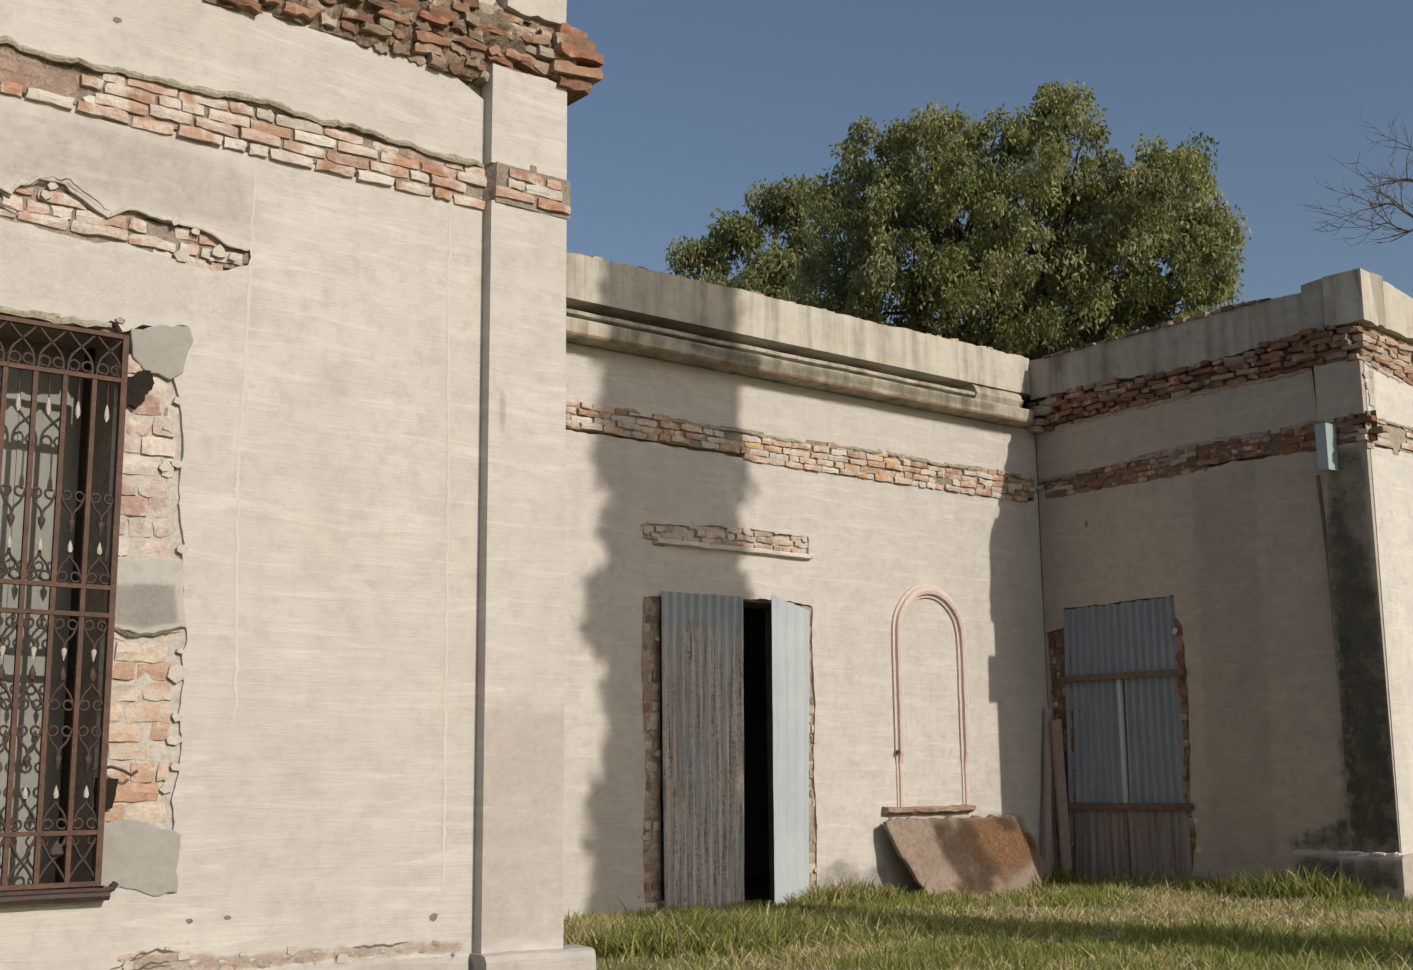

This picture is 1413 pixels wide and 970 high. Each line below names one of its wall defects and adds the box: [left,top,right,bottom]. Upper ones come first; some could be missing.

spalling [0,35,571,219]
flaking render [220,0,604,106]
spalling [0,175,251,271]
flaking render [118,354,183,558]
spalling [640,520,814,560]
spalling [566,324,1413,503]
flaking render [93,629,186,823]
flaking render [638,597,661,912]
flaking render [809,697,821,891]
water stain [1295,509,1399,890]
crack [110,955,165,970]
spalling [118,941,460,970]